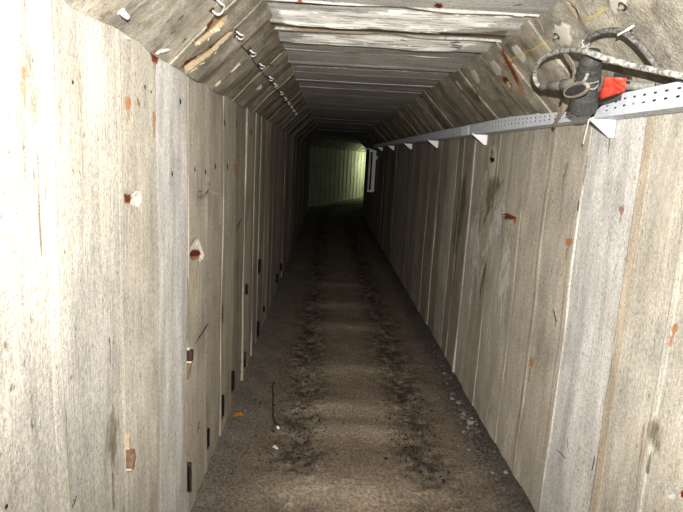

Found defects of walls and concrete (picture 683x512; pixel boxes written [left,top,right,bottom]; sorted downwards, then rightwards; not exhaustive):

spalling [181,7,235,73]
spalling [124,191,141,212]
spalling [190,238,204,262]